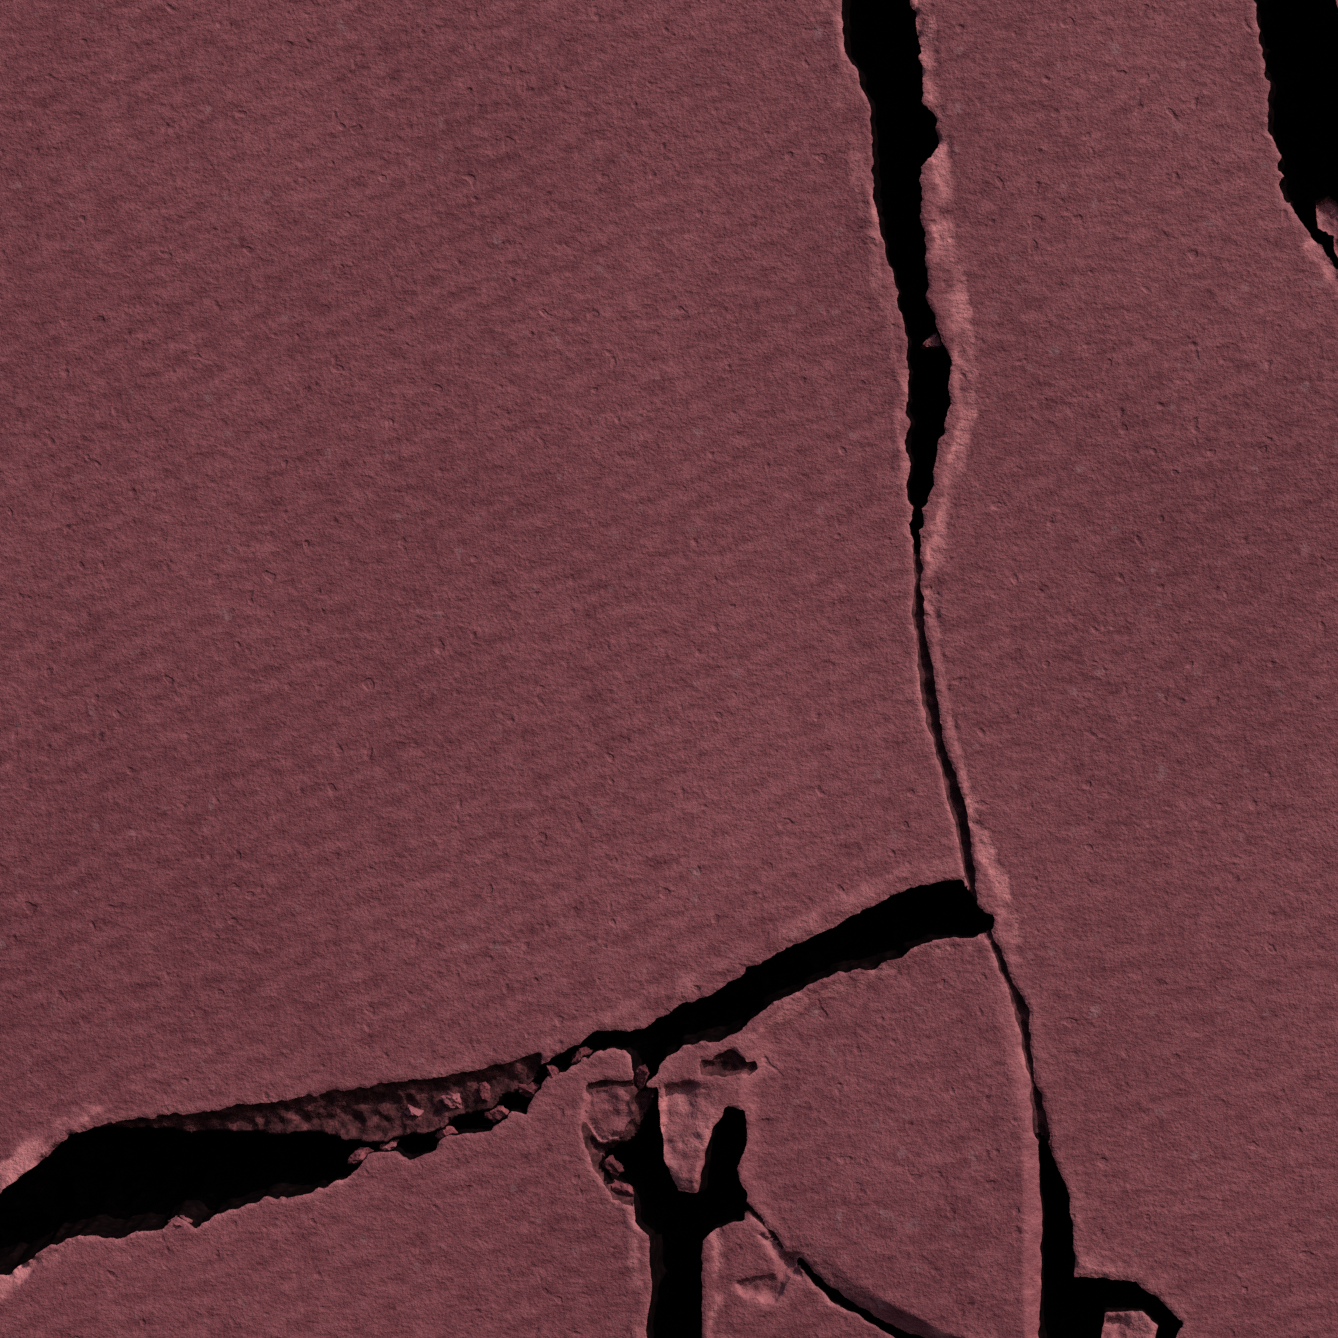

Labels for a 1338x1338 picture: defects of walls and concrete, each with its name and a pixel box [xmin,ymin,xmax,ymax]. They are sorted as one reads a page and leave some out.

crack [1253,0,1338,294]
crack [814,0,1026,963]
crack [0,855,1183,1338]